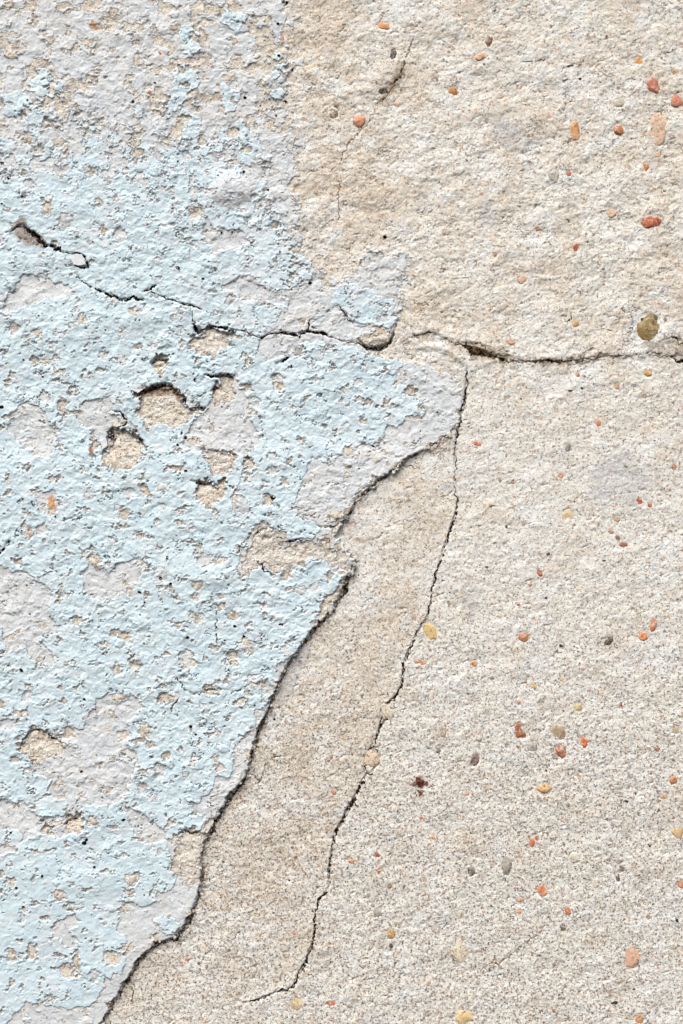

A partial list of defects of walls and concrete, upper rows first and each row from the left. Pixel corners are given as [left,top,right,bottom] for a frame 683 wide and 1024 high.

peeling [200,214,254,252]
peeling [0,271,75,312]
spalling [188,325,236,360]
peeling [7,401,59,458]
peeling [73,354,263,509]
peeling [221,245,464,627]
peeling [32,487,62,517]
peeling [80,557,148,604]
peeling [0,566,61,670]
crack [9,226,683,1024]
peeling [0,693,214,1024]